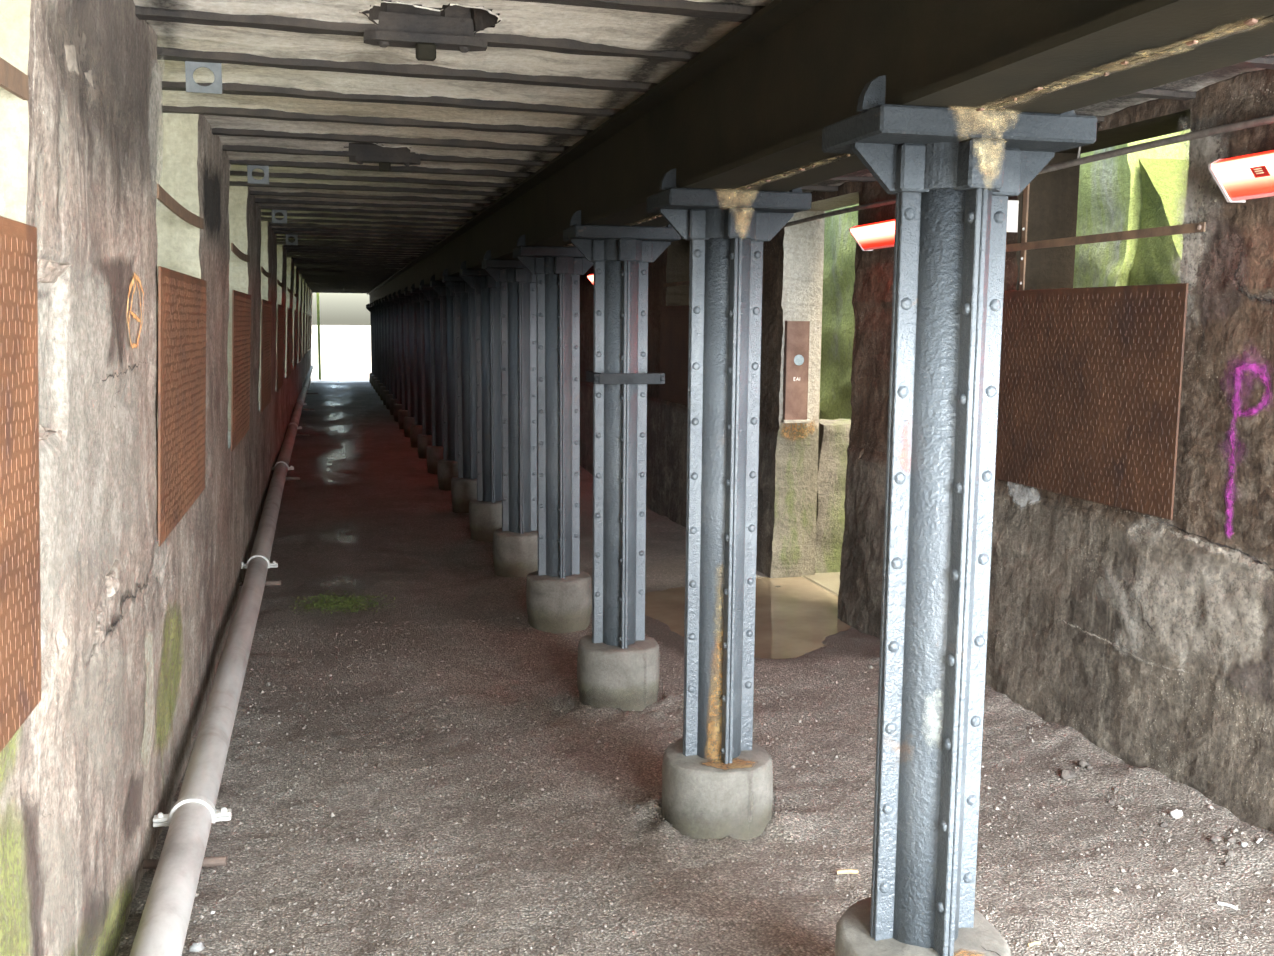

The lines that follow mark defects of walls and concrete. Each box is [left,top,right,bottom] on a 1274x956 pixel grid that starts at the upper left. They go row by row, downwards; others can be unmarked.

crack [87,559,150,665]
corrosion [702,580,756,770]